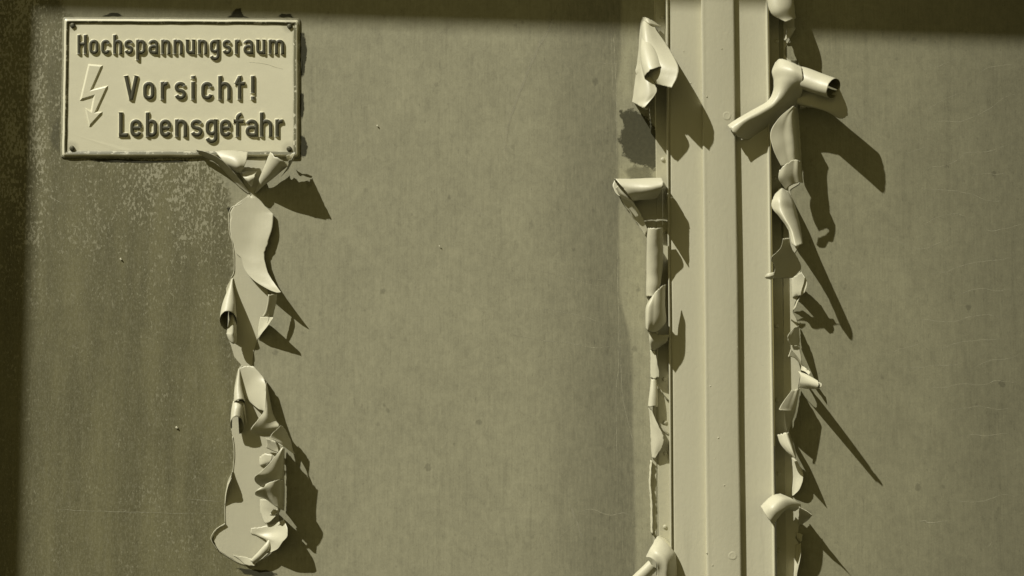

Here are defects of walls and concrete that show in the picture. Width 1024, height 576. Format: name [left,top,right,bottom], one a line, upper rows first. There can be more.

peeling [632,17,679,110]
peeling [196,149,295,567]
peeling [613,178,677,576]
peeling [728,0,848,576]